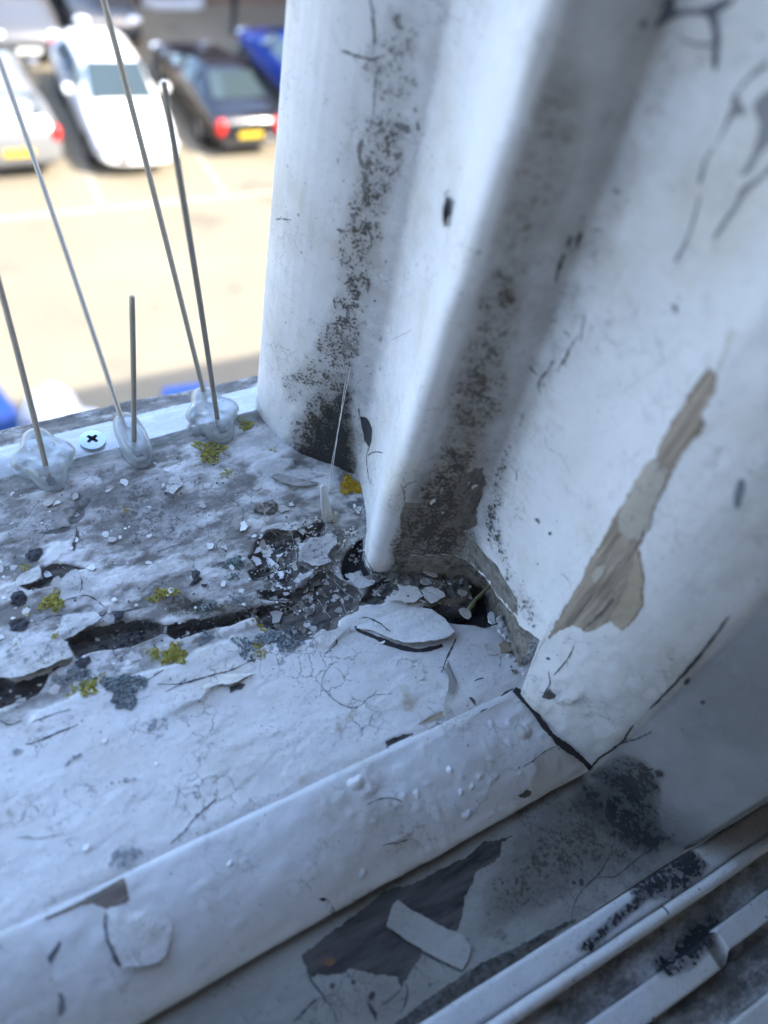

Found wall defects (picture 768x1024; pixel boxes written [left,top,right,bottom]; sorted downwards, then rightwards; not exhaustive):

leakage [282,28,416,473]
leakage [390,152,564,562]
peeling [15,563,86,591]
peeling [0,612,102,678]
peeling [292,532,338,583]
peeling [309,570,455,649]
crack [320,626,456,708]
crack [474,616,729,770]
crack [170,783,217,844]
leakage [602,758,663,822]
peeling [302,836,512,989]
leakage [581,851,706,951]